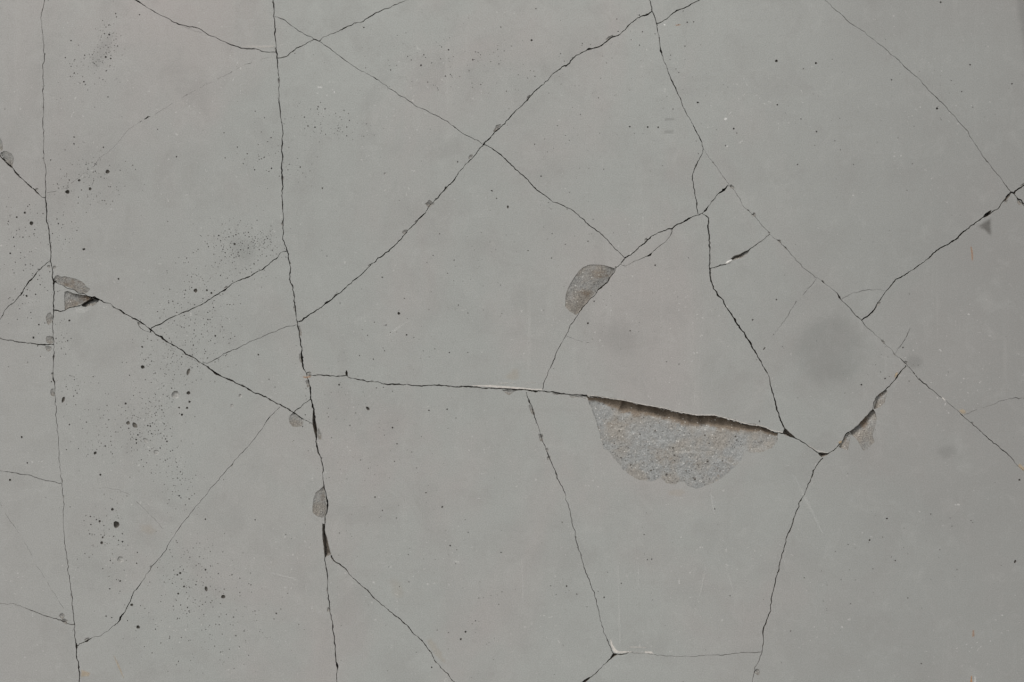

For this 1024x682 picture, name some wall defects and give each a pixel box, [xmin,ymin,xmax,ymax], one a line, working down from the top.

crack [40,82,48,168]
crack [0,154,56,251]
crack [0,257,106,329]
spalling [54,275,99,310]
crack [111,0,848,682]
spalling [565,264,615,315]
crack [774,157,1024,344]
crack [0,336,59,446]
spalling [553,393,778,489]
spalling [839,390,887,451]
crack [873,329,1024,471]
crack [0,451,244,682]